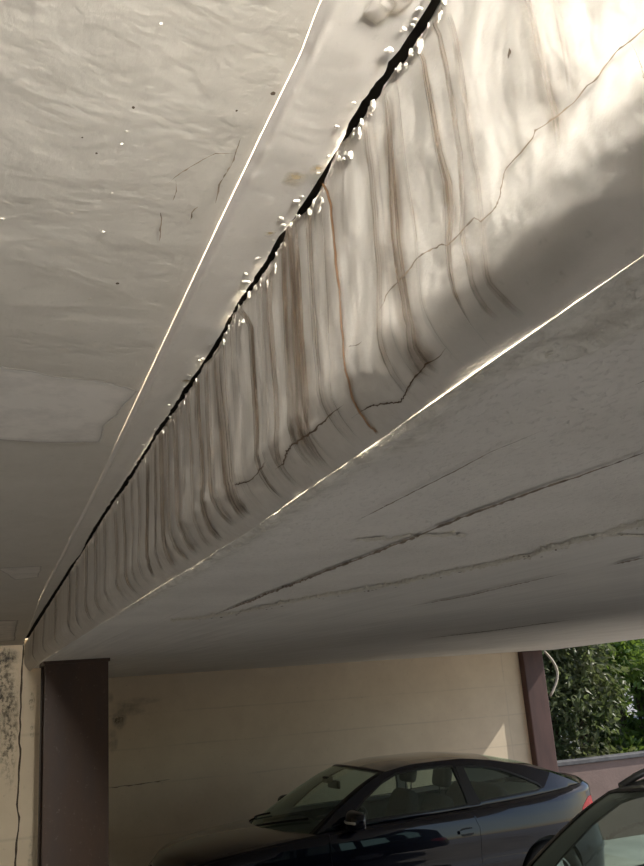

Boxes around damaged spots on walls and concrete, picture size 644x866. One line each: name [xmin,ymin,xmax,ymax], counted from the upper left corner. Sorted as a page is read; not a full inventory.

crack [376,29,644,315]
crack [14,0,445,866]
corrosion [321,183,377,433]
crack [224,453,643,611]
crack [363,431,541,518]